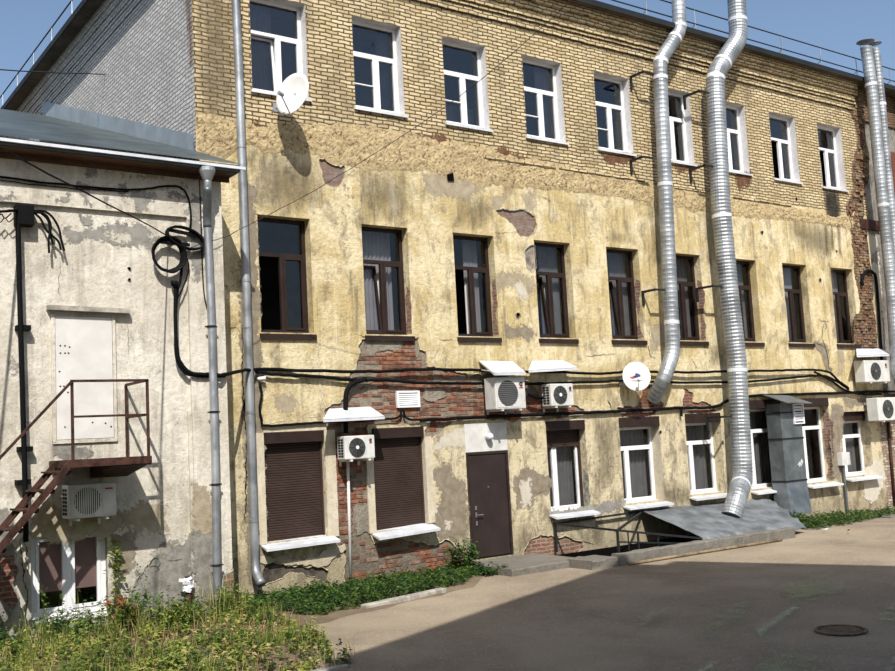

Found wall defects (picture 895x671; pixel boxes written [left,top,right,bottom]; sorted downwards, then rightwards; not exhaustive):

peeling [48,168,205,282]
spalling [196,111,659,342]
spalling [673,188,712,213]
spalling [730,91,885,349]
flaking render [237,183,585,588]
peeling [813,340,845,376]
flaking render [0,554,19,608]
flaking render [221,568,235,601]